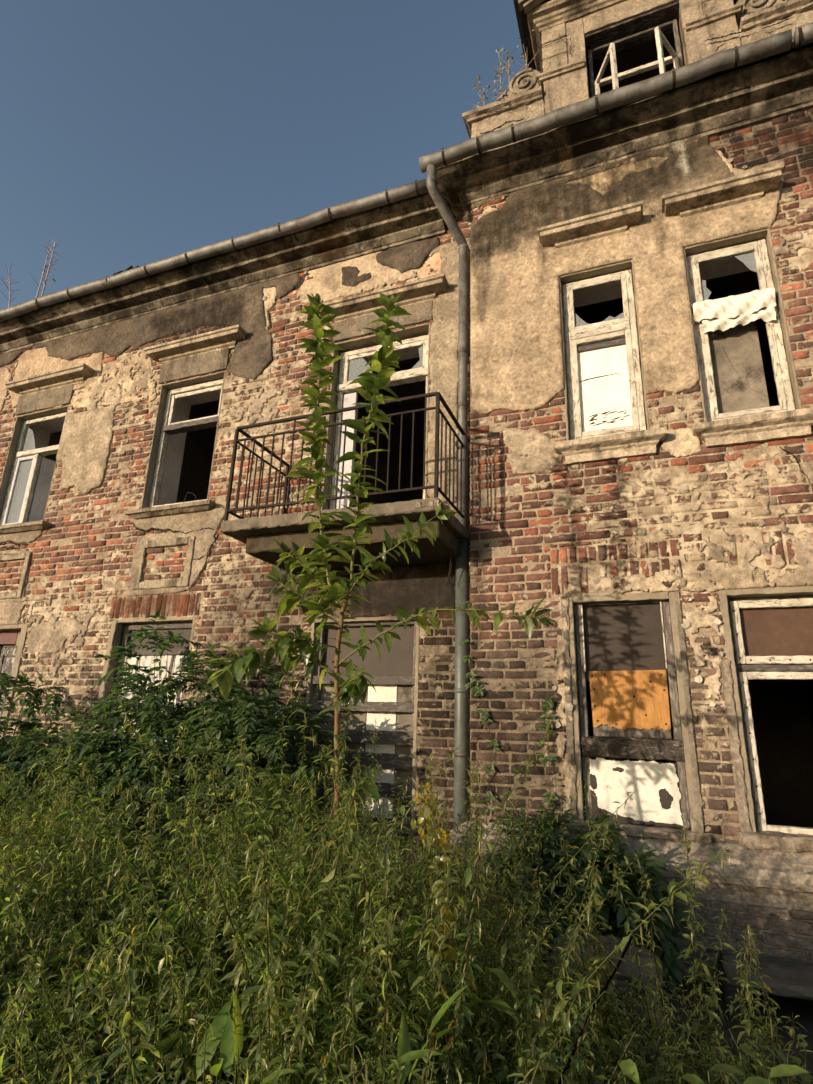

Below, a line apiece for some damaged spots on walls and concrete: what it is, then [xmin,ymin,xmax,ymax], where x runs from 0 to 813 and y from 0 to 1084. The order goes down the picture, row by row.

peeling [715,149,785,176]
leakage [473,141,703,254]
peeling [263,287,277,330]
peeling [291,251,445,304]
peeling [70,347,157,409]
spalling [589,410,630,426]
crack [132,523,218,588]
spalling [52,619,83,638]
peeling [680,596,723,707]
peeling [552,597,577,806]